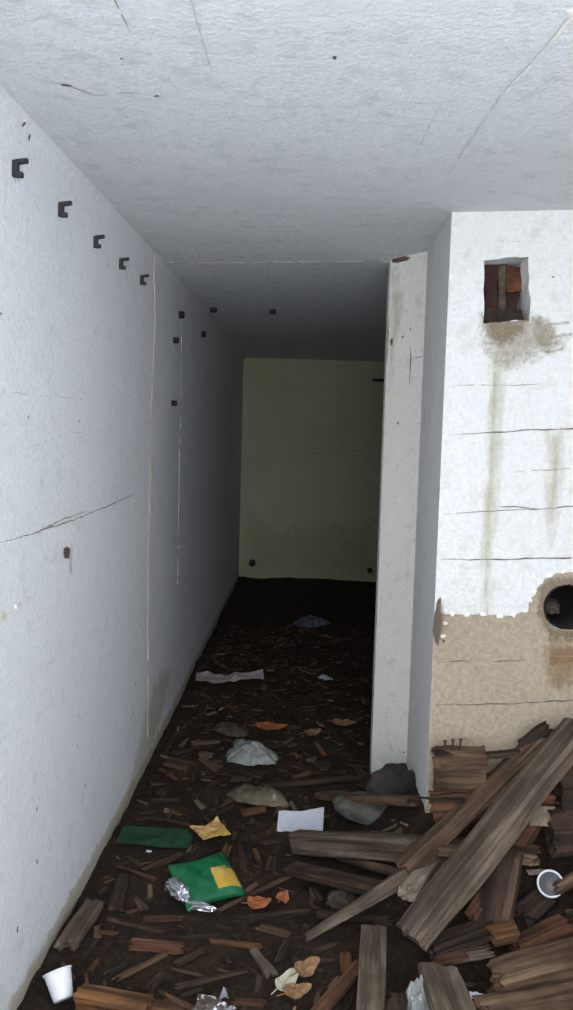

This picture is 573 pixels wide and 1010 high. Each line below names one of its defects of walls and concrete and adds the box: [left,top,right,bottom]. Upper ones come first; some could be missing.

crack [38,0,256,107]
crack [435,17,569,196]
damp [483,317,525,344]
crack [458,427,573,435]
crack [4,492,138,542]
crack [449,506,573,514]
crack [441,554,572,562]
peeling [426,569,573,813]